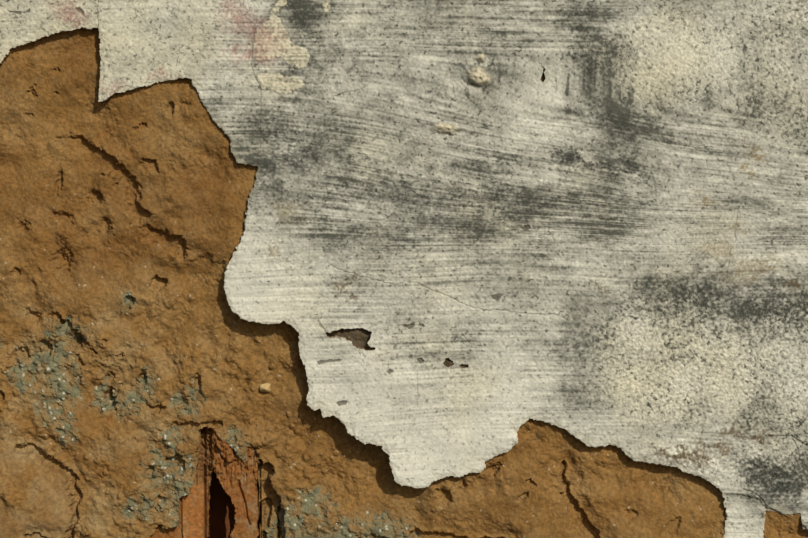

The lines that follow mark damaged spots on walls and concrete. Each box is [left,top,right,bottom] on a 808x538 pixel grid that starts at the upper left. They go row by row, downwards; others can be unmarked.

crack [223,0,297,161]
peeling [254,0,311,96]
spalling [123,289,137,311]
crack [329,265,568,349]
spalling [92,373,158,422]
spalling [0,442,74,538]
spalling [121,494,155,524]
spalling [146,427,202,517]
spalling [208,468,236,538]
spalling [266,524,279,538]
spalling [284,485,411,538]
spalling [763,510,808,538]